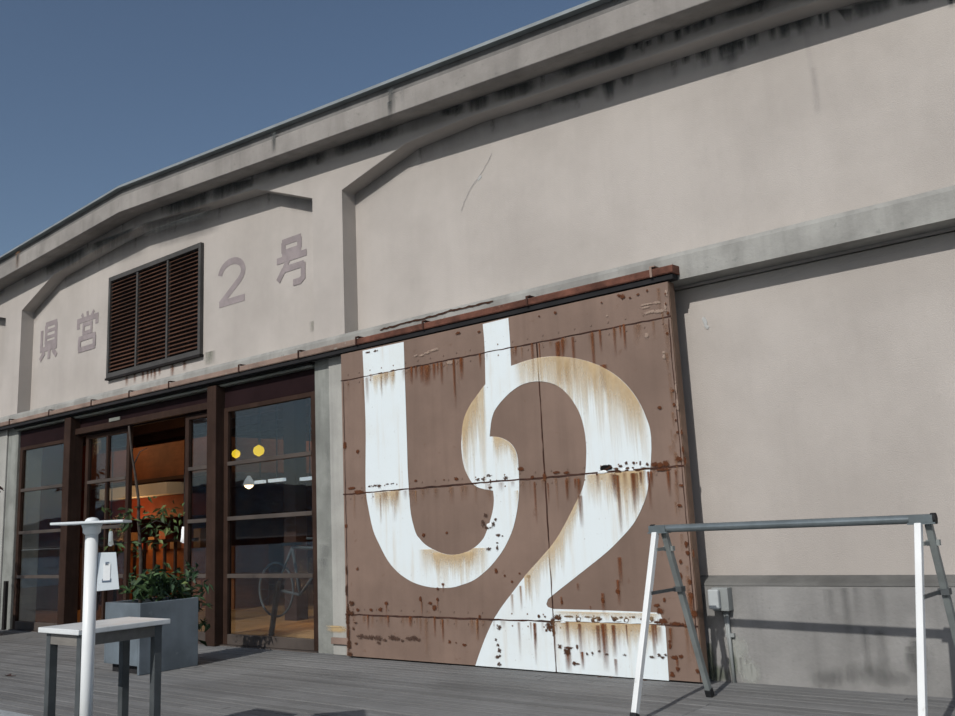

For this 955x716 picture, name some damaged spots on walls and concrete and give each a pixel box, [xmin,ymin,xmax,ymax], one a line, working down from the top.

water stain [771,0,888,33]
water stain [564,35,662,72]
rust [410,358,462,378]
rust [523,330,639,408]
rust [462,387,483,437]
rust [375,491,398,508]
rust [495,446,686,596]
rust [424,548,478,565]
rust [330,567,388,656]
rust [419,583,466,646]
rust [530,541,698,677]